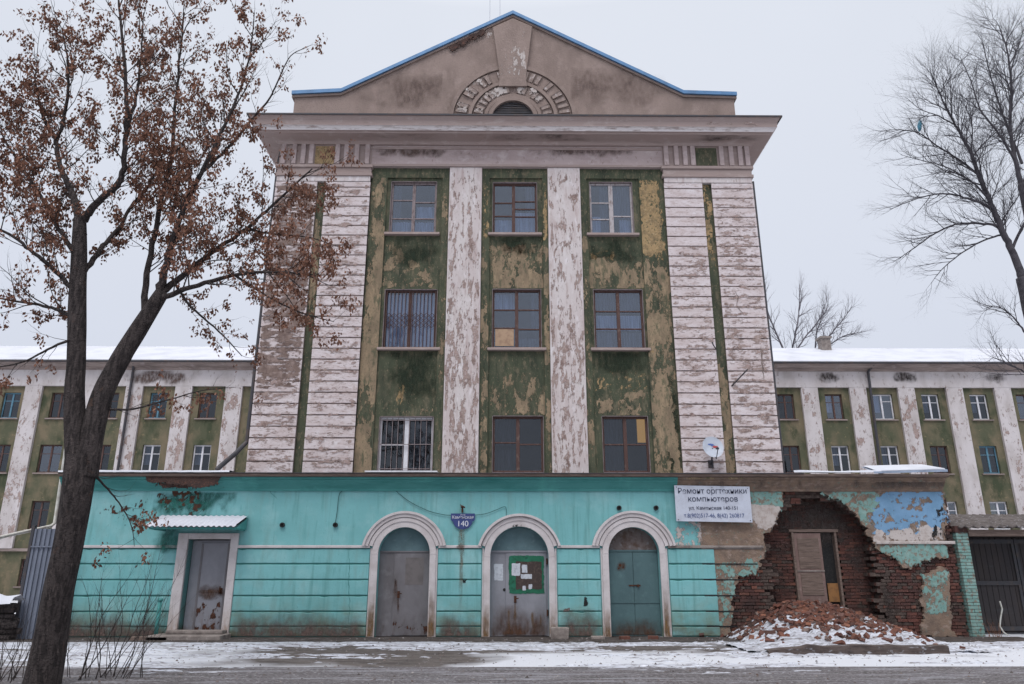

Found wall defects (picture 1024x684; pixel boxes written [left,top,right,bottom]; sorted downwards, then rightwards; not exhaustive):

peeling [457,46,542,112]
peeling [420,170,780,473]
peeling [0,389,40,537]
leakage [159,493,221,515]
leakage [157,530,178,552]
peeling [711,492,969,637]
rust [194,589,223,630]